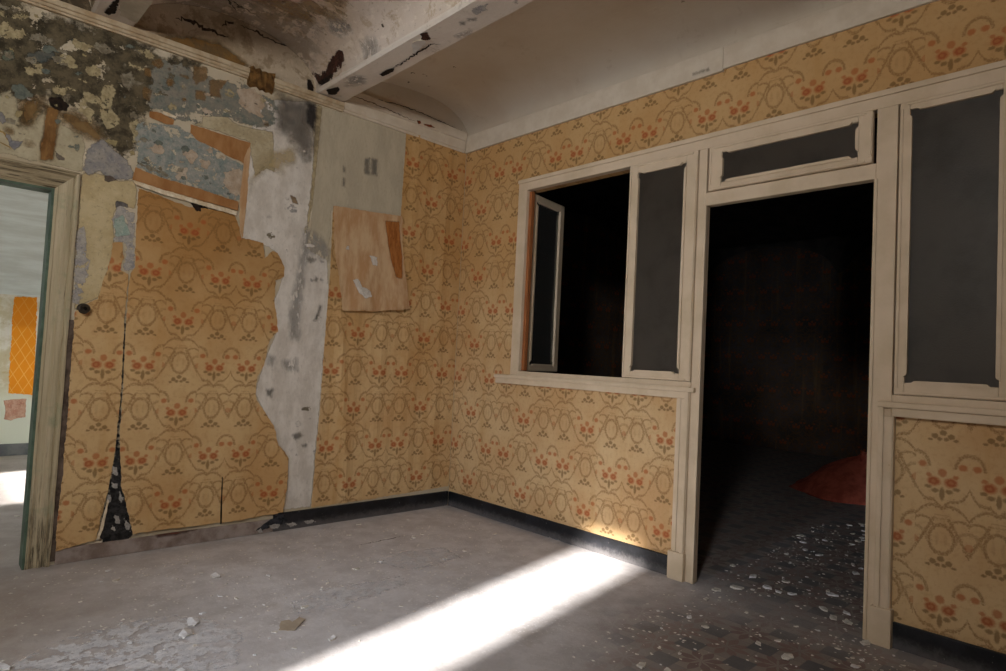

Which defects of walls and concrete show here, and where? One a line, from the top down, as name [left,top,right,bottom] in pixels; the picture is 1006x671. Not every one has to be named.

spalling [104,0,120,15]
crack [176,0,286,46]
damp [0,0,248,158]
spalling [380,32,437,83]
flaking render [0,3,406,533]